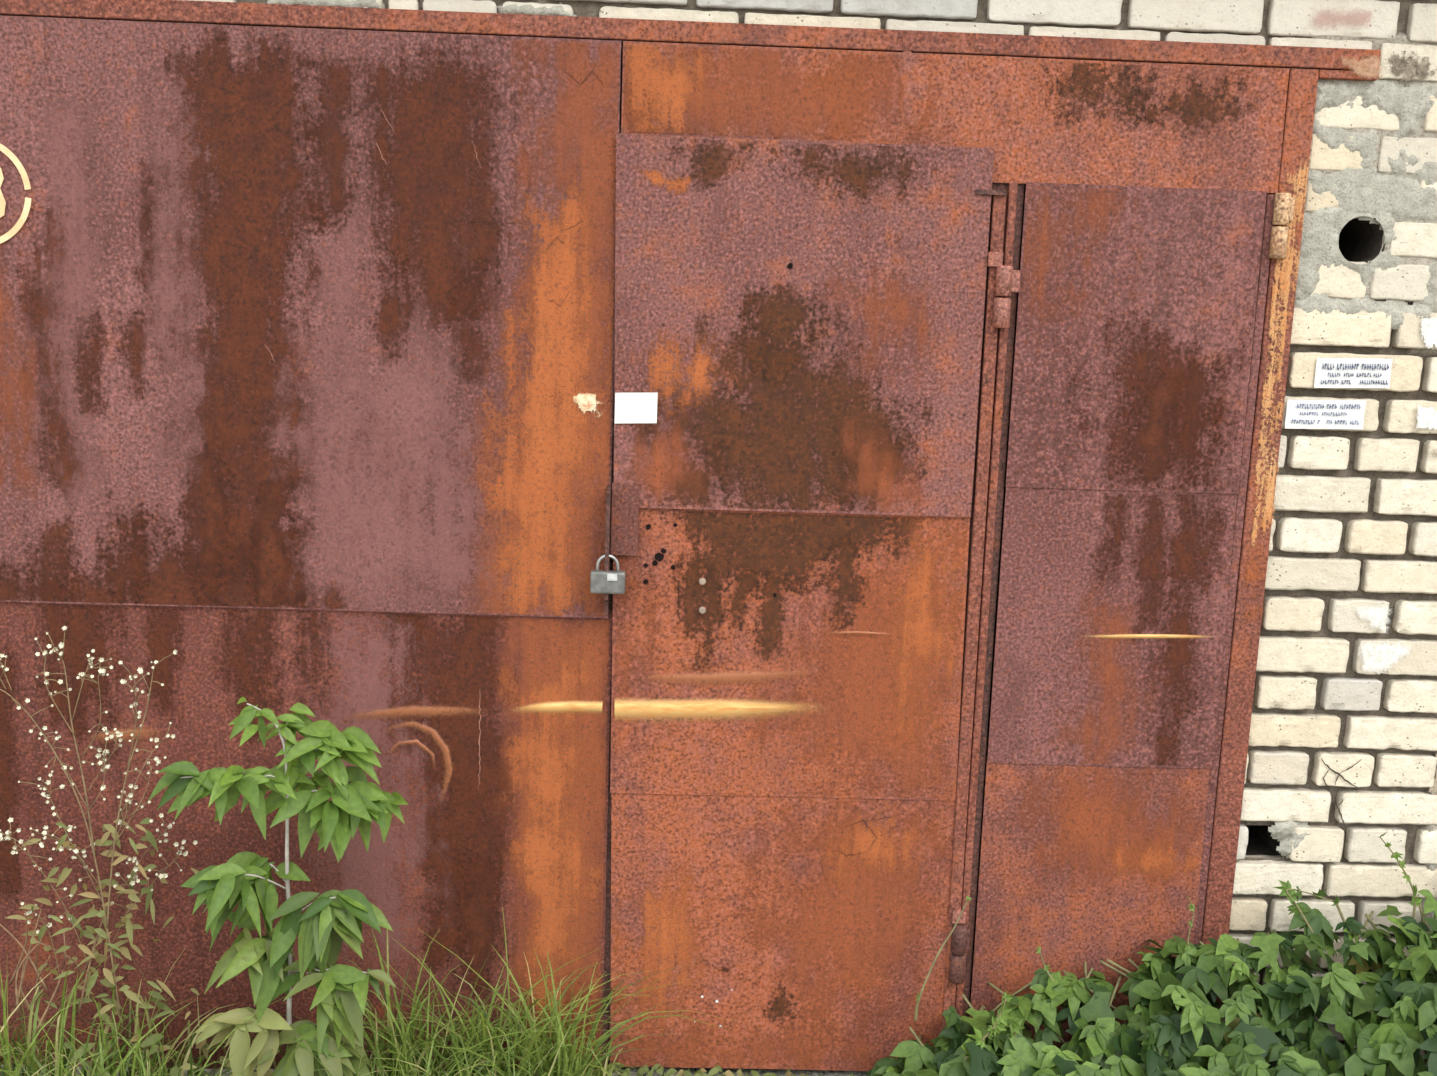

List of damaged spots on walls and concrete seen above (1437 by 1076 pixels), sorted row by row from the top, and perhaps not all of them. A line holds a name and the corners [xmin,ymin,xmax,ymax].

peeling [1317,79,1338,112]
peeling [1393,107,1424,141]
spalling [1338,218,1386,263]
corrosion [0,27,935,1072]
corrosion [1068,311,1245,766]
spalling [1241,820,1312,860]